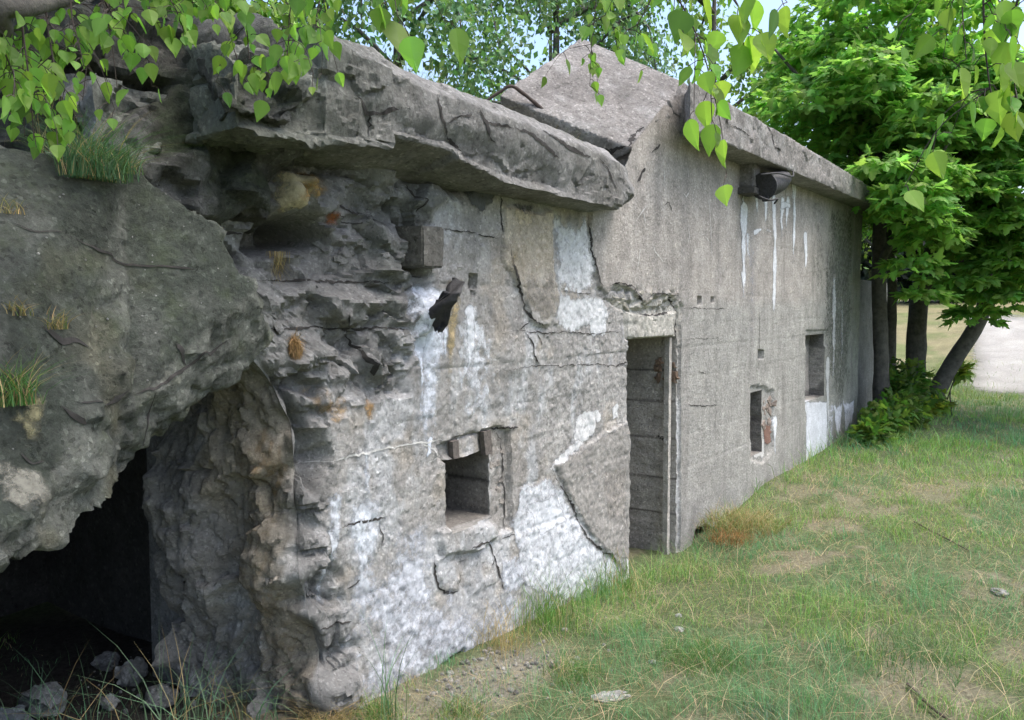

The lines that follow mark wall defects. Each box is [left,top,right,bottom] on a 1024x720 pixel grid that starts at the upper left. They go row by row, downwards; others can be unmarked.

leakage [407,286,490,456]
crack [450,198,627,370]
peeling [527,218,670,336]
leakage [740,184,852,442]
crack [297,439,442,470]
crack [434,559,461,594]
crack [553,470,617,566]